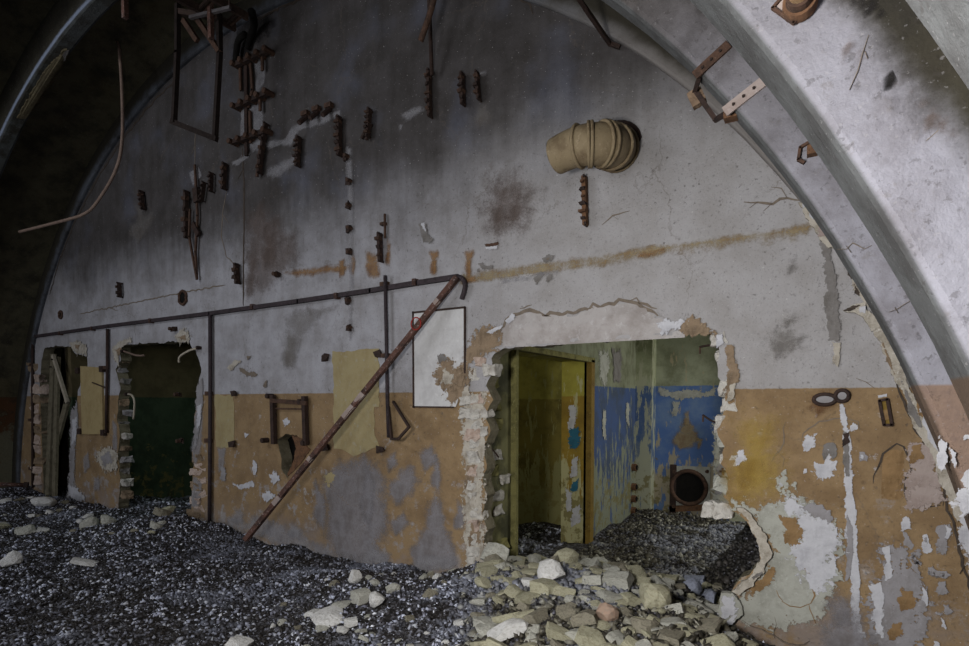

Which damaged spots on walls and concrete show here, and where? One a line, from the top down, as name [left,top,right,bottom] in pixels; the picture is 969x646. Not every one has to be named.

crack [744,187,799,210]
corrosion [766,225,810,237]
corrosion [292,245,390,277]
corrosion [430,252,438,274]
corrosion [460,235,750,284]
peeling [598,347,623,386]
spalling [186,378,207,519]
peeling [220,460,280,504]
spalling [288,435,298,463]
spalling [432,313,515,567]
peeling [565,405,584,527]
peeling [656,202,969,646]